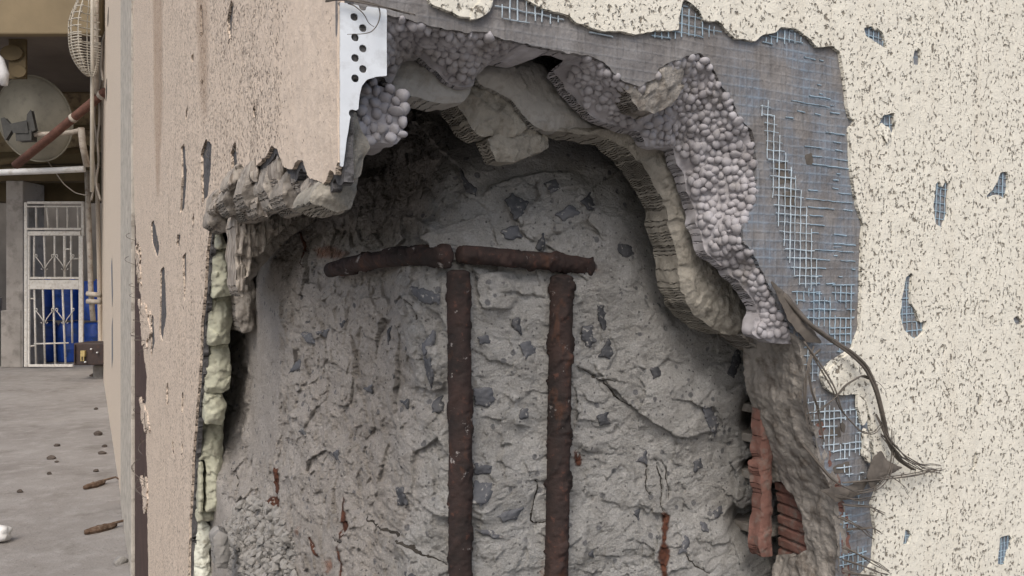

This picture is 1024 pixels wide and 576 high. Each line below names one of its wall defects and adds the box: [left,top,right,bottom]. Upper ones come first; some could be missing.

flaking render [933,179,949,227]
flaking render [987,170,1010,198]
spalling [182,0,871,576]
flaking render [900,269,923,338]
crack [577,366,630,406]
corrosion [296,497,348,576]
corrosion [658,512,670,576]